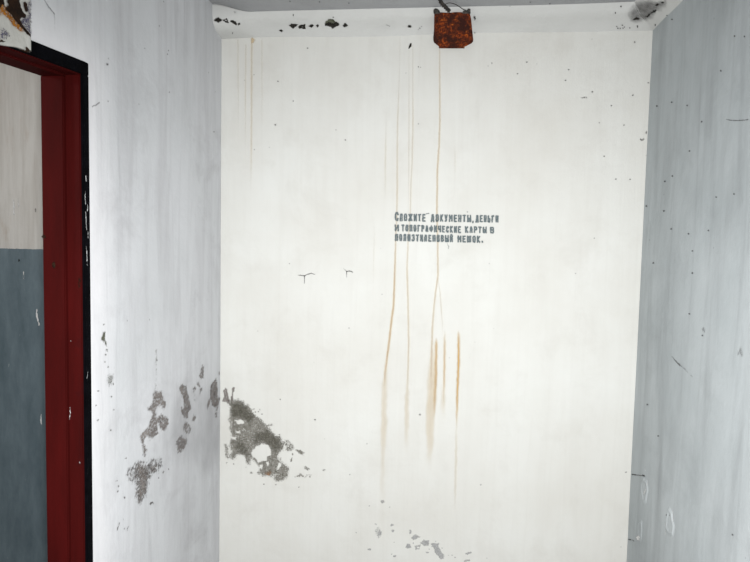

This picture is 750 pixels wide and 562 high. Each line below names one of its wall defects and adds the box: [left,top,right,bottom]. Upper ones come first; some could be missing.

peeling [222,387,303,485]
peeling [406,530,443,559]